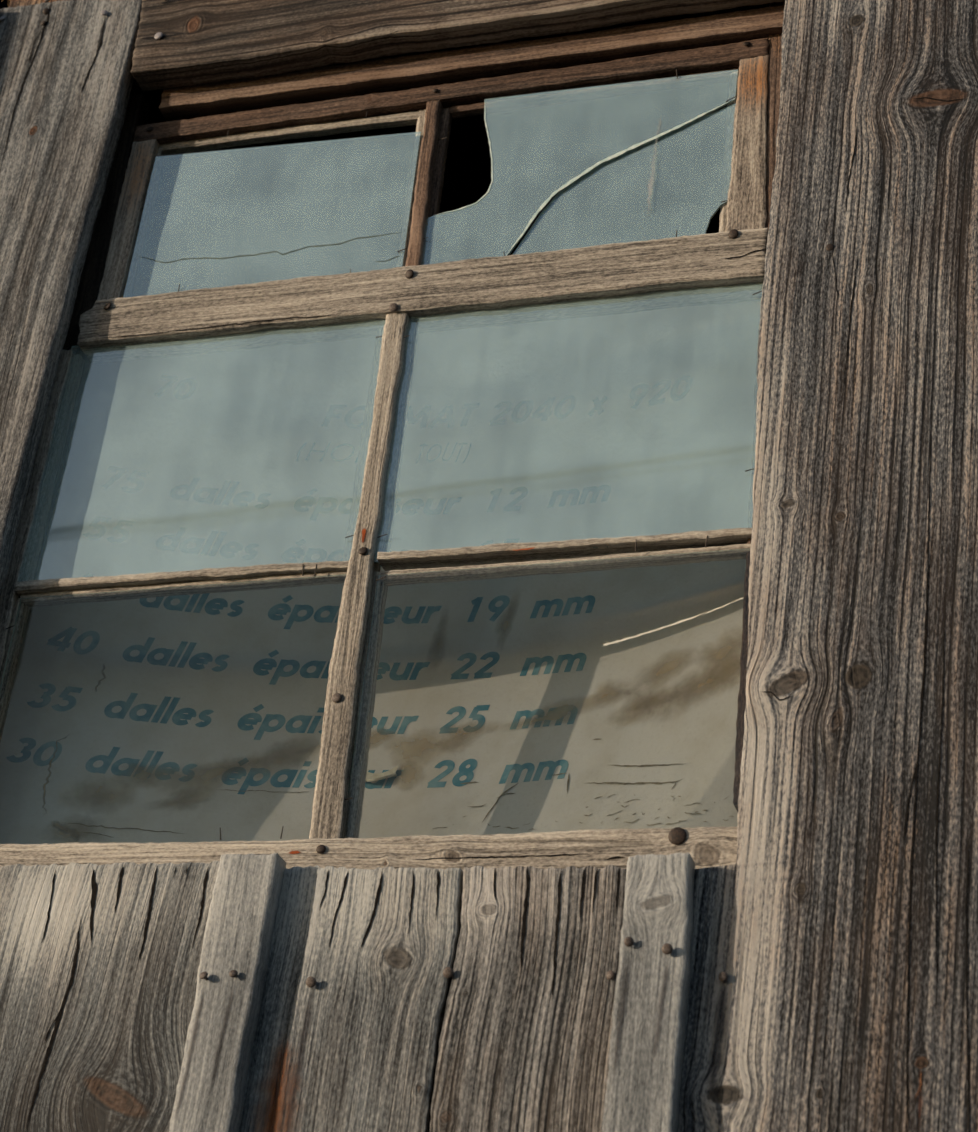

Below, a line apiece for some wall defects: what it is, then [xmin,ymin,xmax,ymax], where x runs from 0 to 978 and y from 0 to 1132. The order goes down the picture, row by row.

crack [25,867,124,1131]
crack [137,866,209,967]